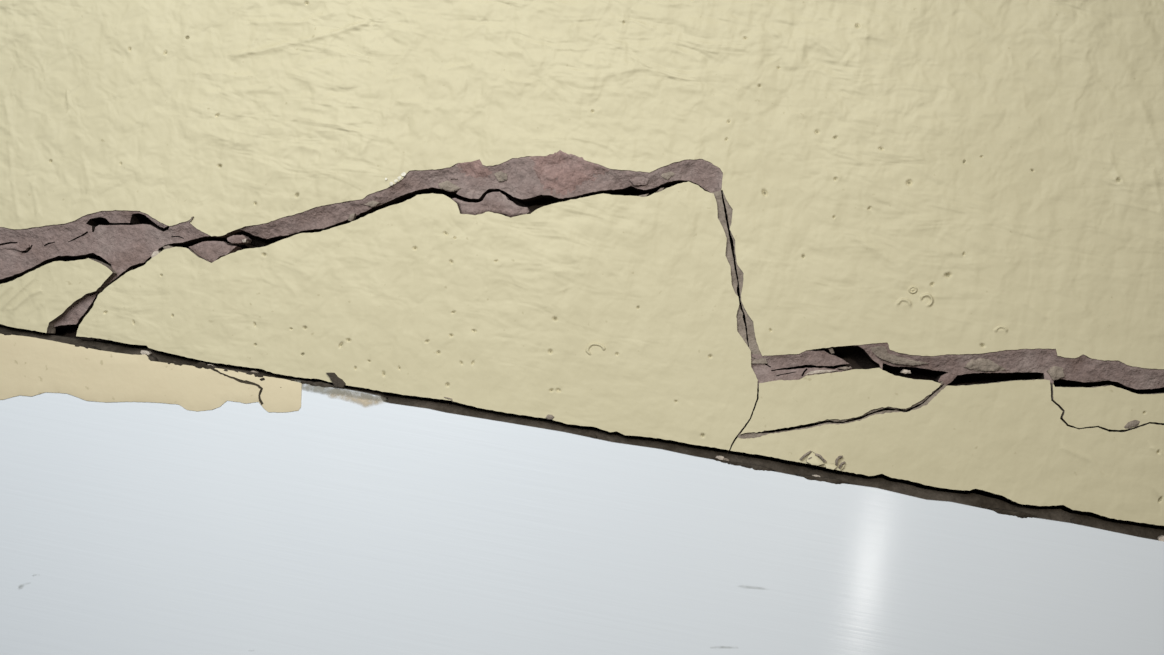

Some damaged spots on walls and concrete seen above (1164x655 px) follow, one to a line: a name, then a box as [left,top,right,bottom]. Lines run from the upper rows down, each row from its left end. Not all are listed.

spalling [0,150,723,412]
crack [0,191,1164,541]
spalling [740,343,1164,435]